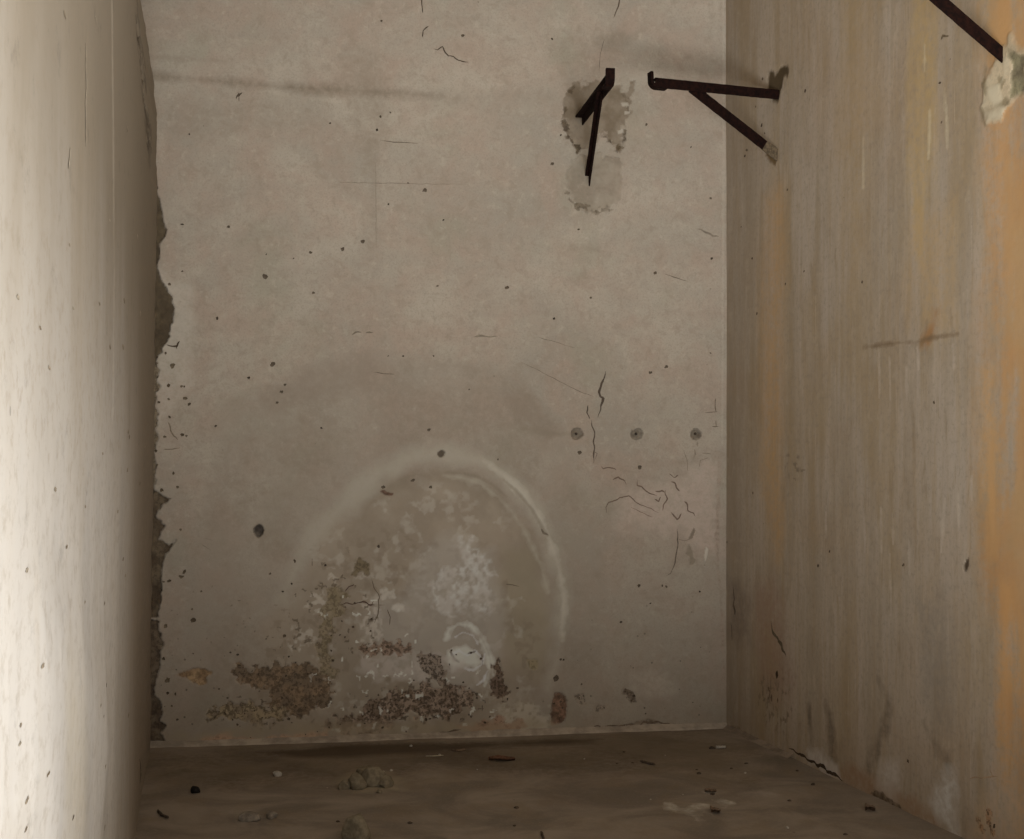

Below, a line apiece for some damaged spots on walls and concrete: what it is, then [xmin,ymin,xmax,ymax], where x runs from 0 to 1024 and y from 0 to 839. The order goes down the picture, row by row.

flaking render [1004,47,1024,106]
flaking render [135,0,519,741]
crack [586,371,719,575]
corrosion [964,0,1024,839]
water stain [143,344,904,824]
flaking render [550,675,606,723]
corrosion [751,562,805,725]
crack [789,748,842,781]